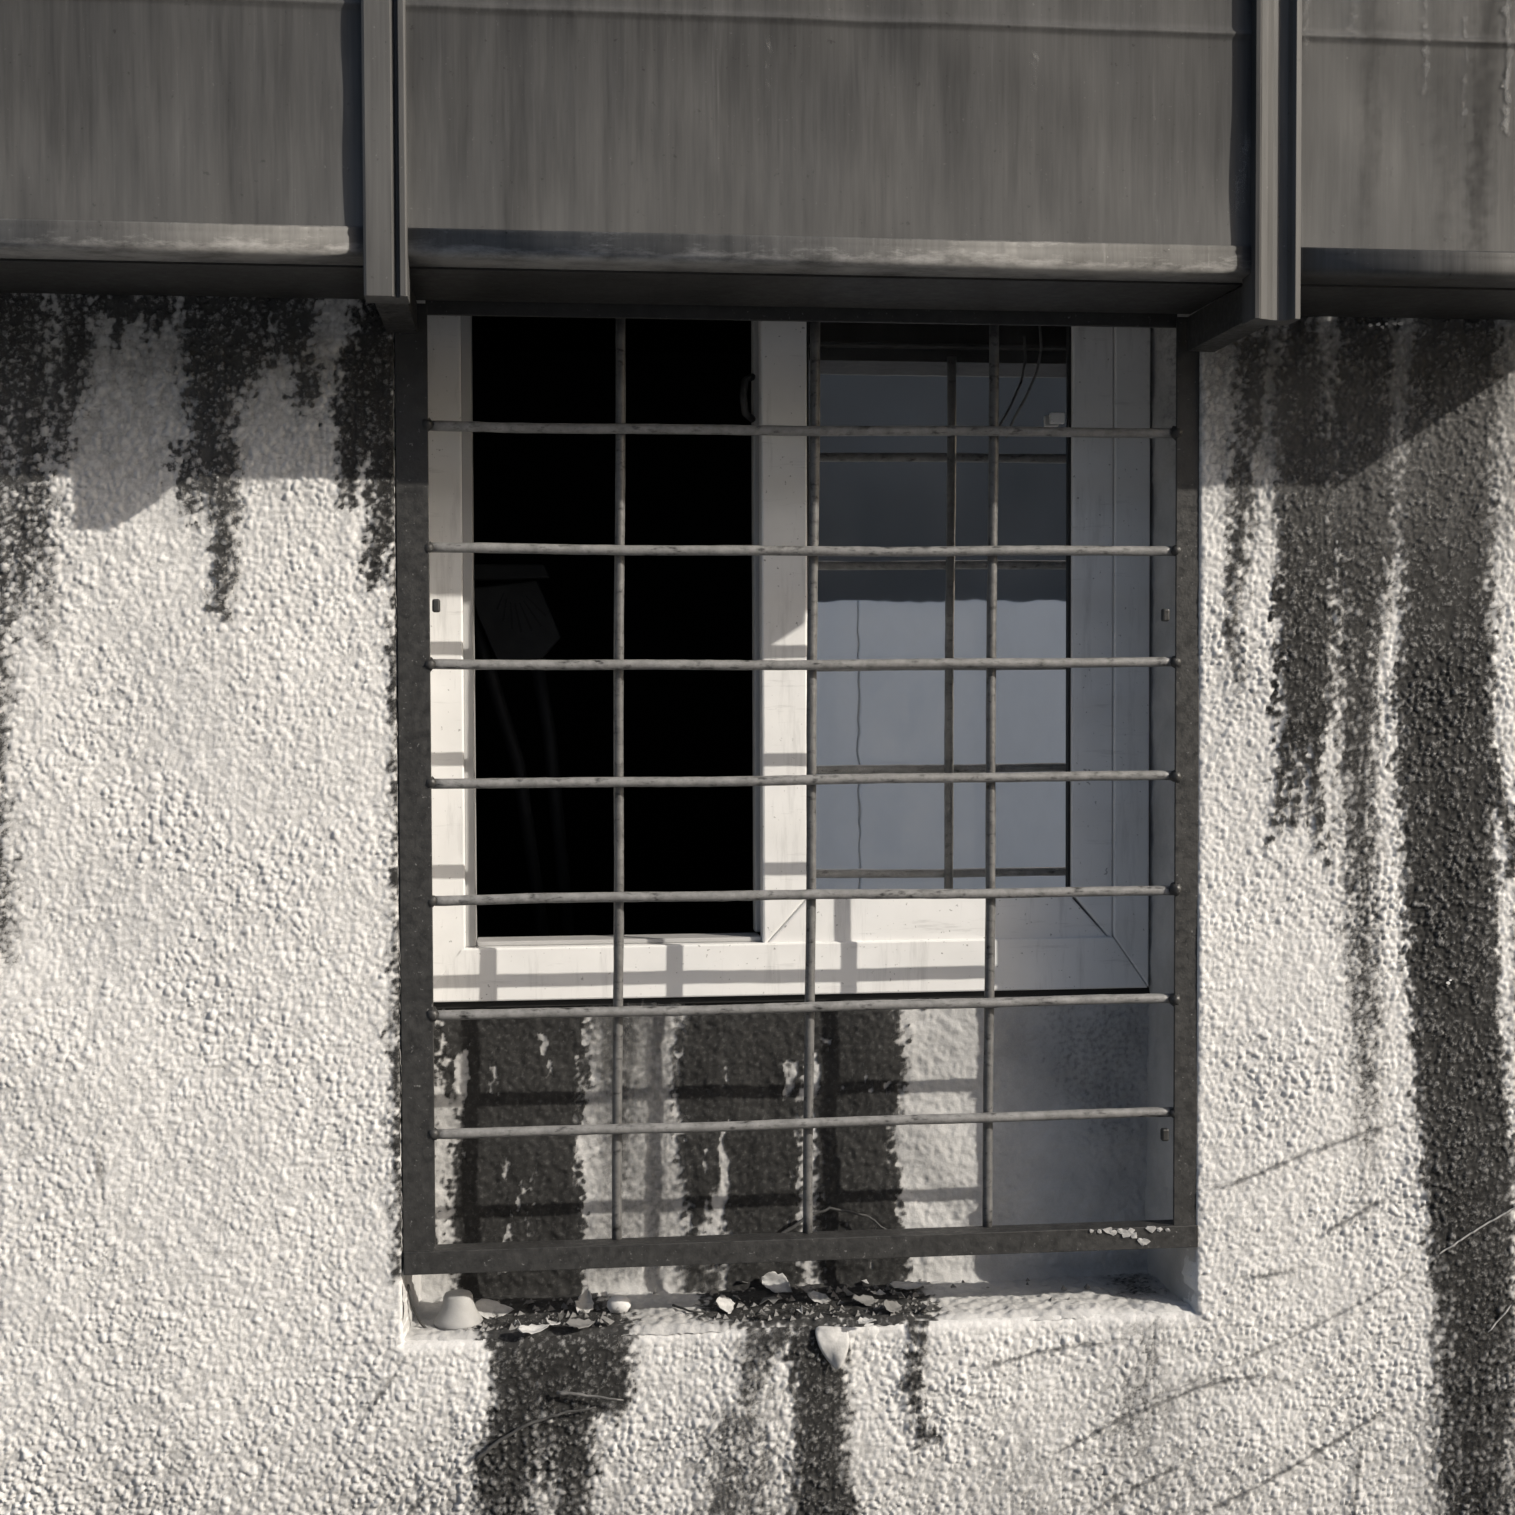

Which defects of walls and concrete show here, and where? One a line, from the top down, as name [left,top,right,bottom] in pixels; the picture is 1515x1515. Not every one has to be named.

damp [1502,4,1512,130]
damp [0,293,402,1283]
damp [1209,316,1515,1515]
damp [434,998,912,1244]
damp [451,1269,641,1515]
damp [666,1257,948,1515]